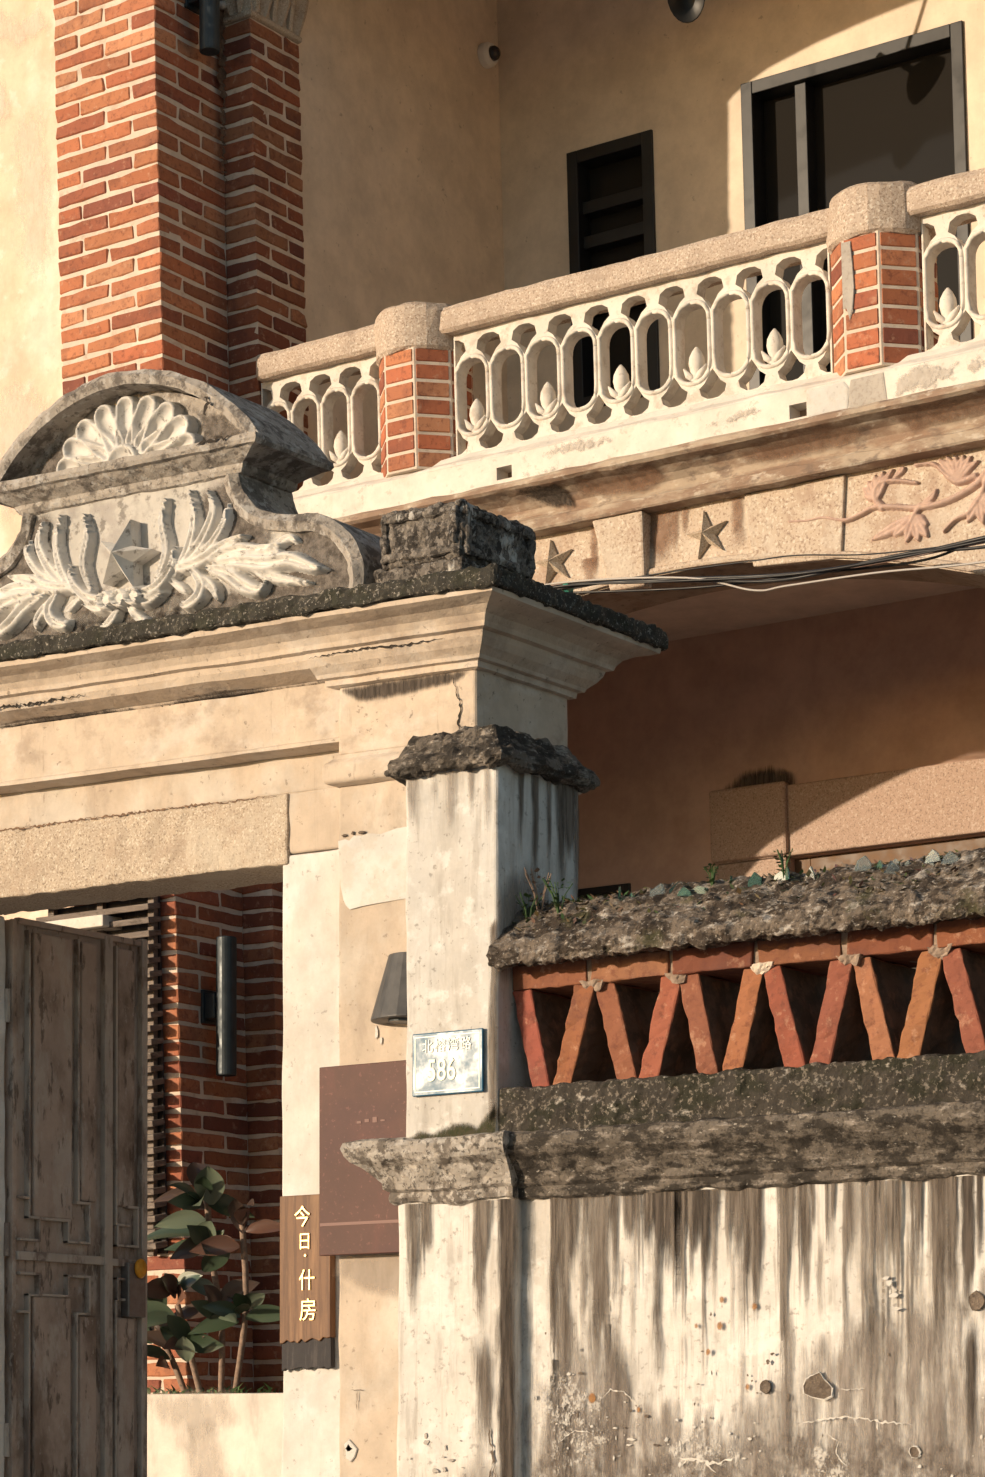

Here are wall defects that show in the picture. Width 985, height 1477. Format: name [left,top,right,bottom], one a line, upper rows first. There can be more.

crack [453,678,461,729]
damp [447,766,488,815]
damp [490,773,579,945]
damp [488,967,497,1121]
damp [473,1175,985,1477]
spalling [747,1353,834,1402]